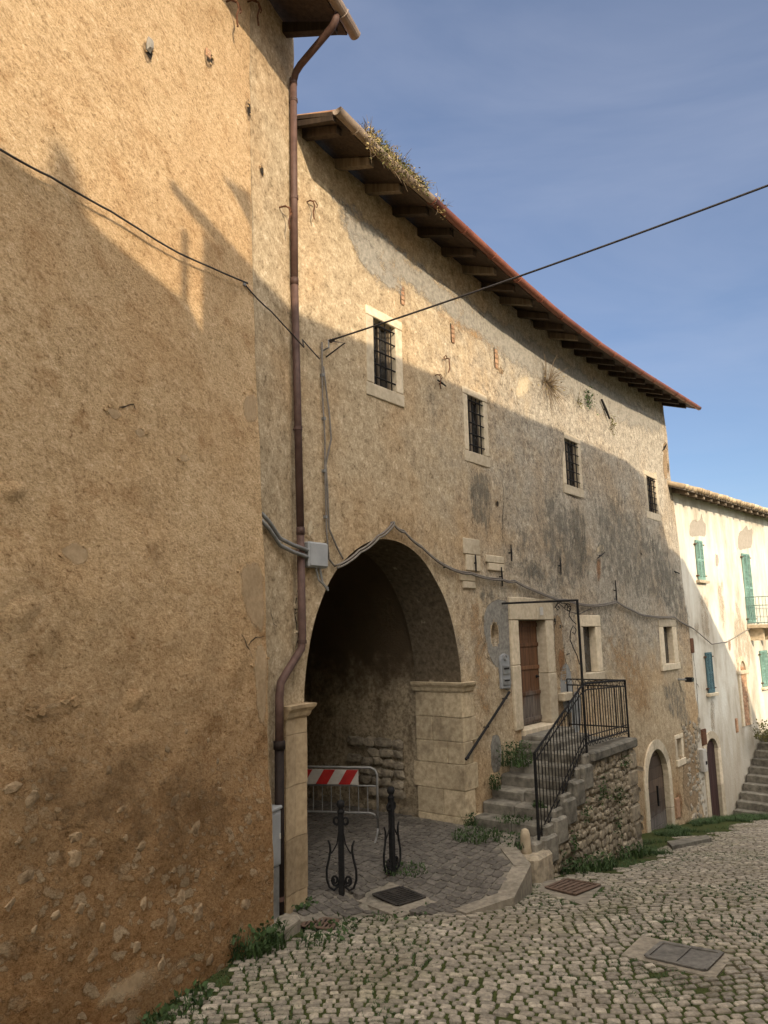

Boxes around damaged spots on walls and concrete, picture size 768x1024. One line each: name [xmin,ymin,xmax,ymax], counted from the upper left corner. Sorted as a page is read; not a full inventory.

leakage [471,473,491,528]
flaking render [689,514,706,537]
flaking render [737,526,753,550]
leakage [517,494,709,636]
flaking render [68,832,82,868]